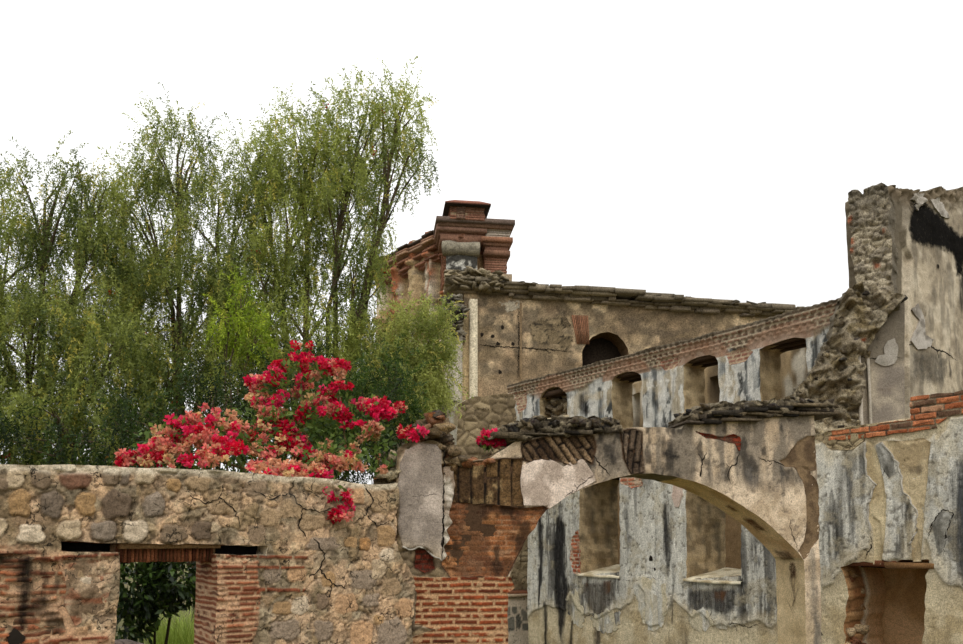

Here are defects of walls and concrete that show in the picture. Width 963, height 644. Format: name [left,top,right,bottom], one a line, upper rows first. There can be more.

peeling [875,338,898,366]
peeling [910,304,934,350]
crack [698,452,785,481]
crack [255,481,346,598]
spalling [402,436,595,644]
spalling [780,425,931,564]
leakage [952,462,963,564]
peeling [566,589,621,634]
peeling [632,577,668,631]
peeling [688,607,729,633]